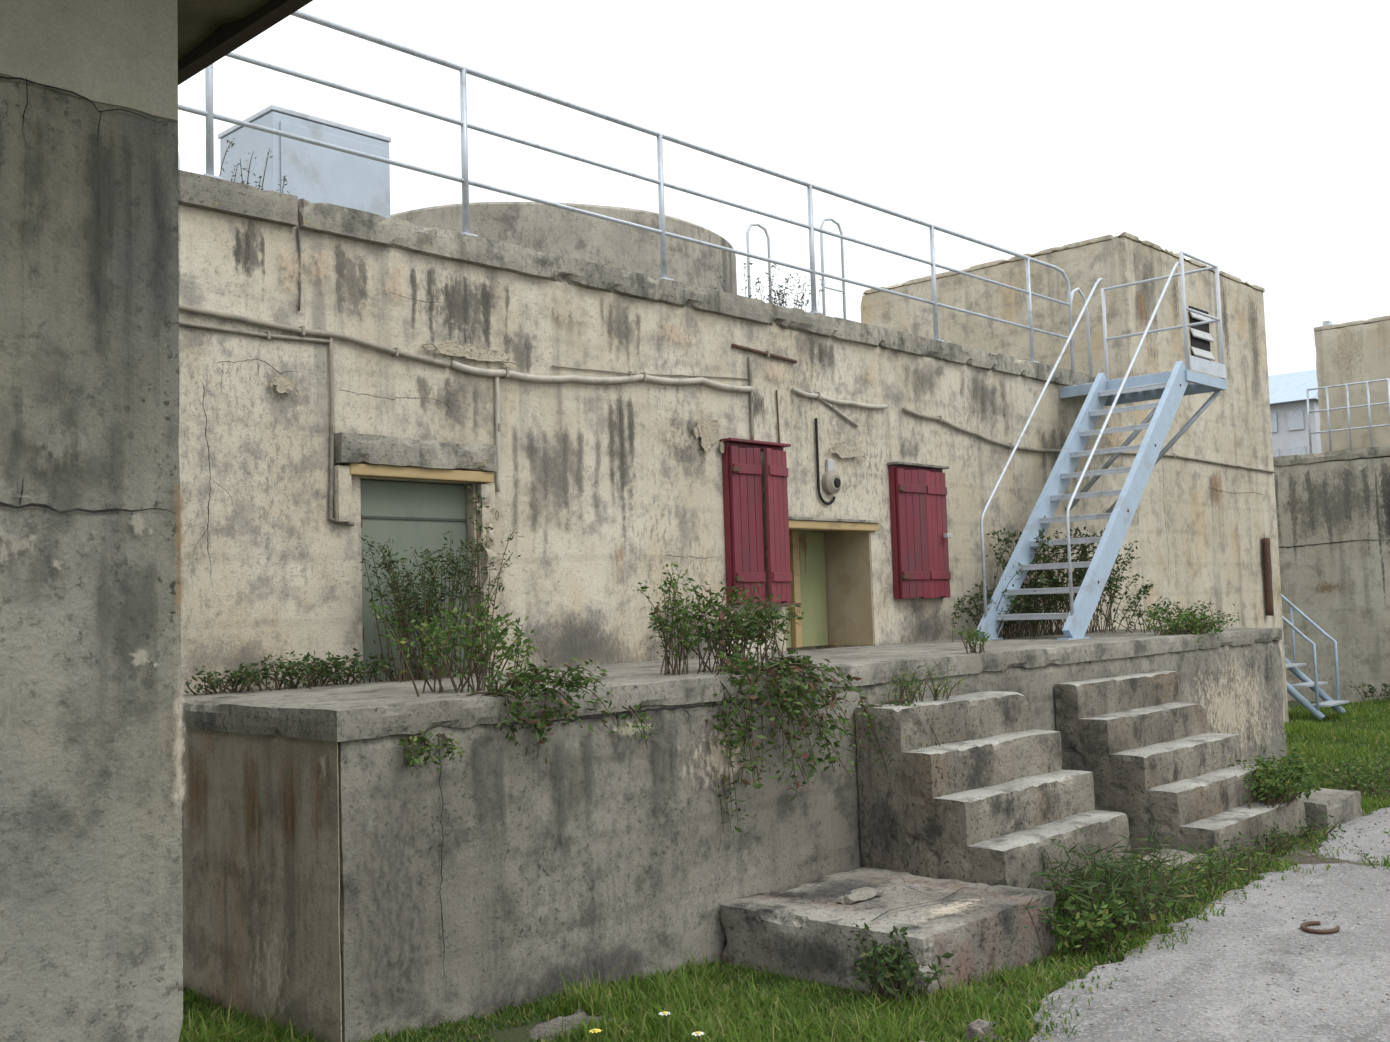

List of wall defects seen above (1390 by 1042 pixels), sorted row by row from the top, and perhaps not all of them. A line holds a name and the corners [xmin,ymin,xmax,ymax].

crack [0,76,181,142]
damp [234,221,265,275]
damp [411,270,533,371]
crack [0,358,302,587]
damp [513,397,635,554]
damp [1262,463,1390,598]